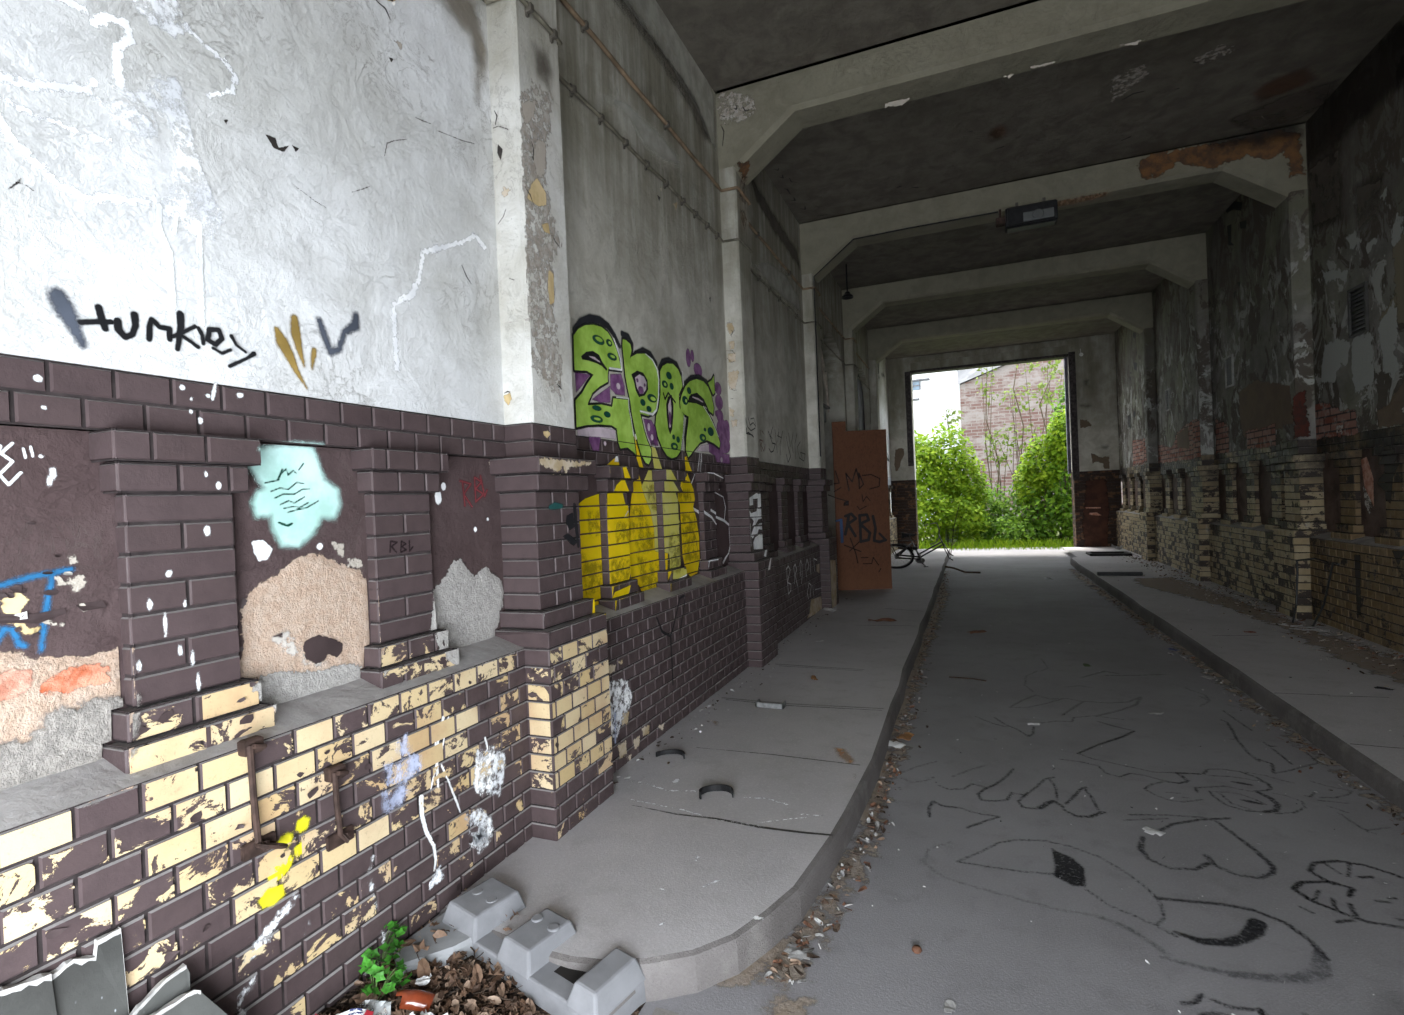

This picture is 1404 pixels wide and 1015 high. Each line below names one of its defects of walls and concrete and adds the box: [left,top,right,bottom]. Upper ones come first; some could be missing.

flaking render [493,81,562,402]
peeling [1346,187,1404,254]
peeling [1291,295,1399,440]
flaking render [1132,419,1201,466]
flaking render [0,541,664,1015]